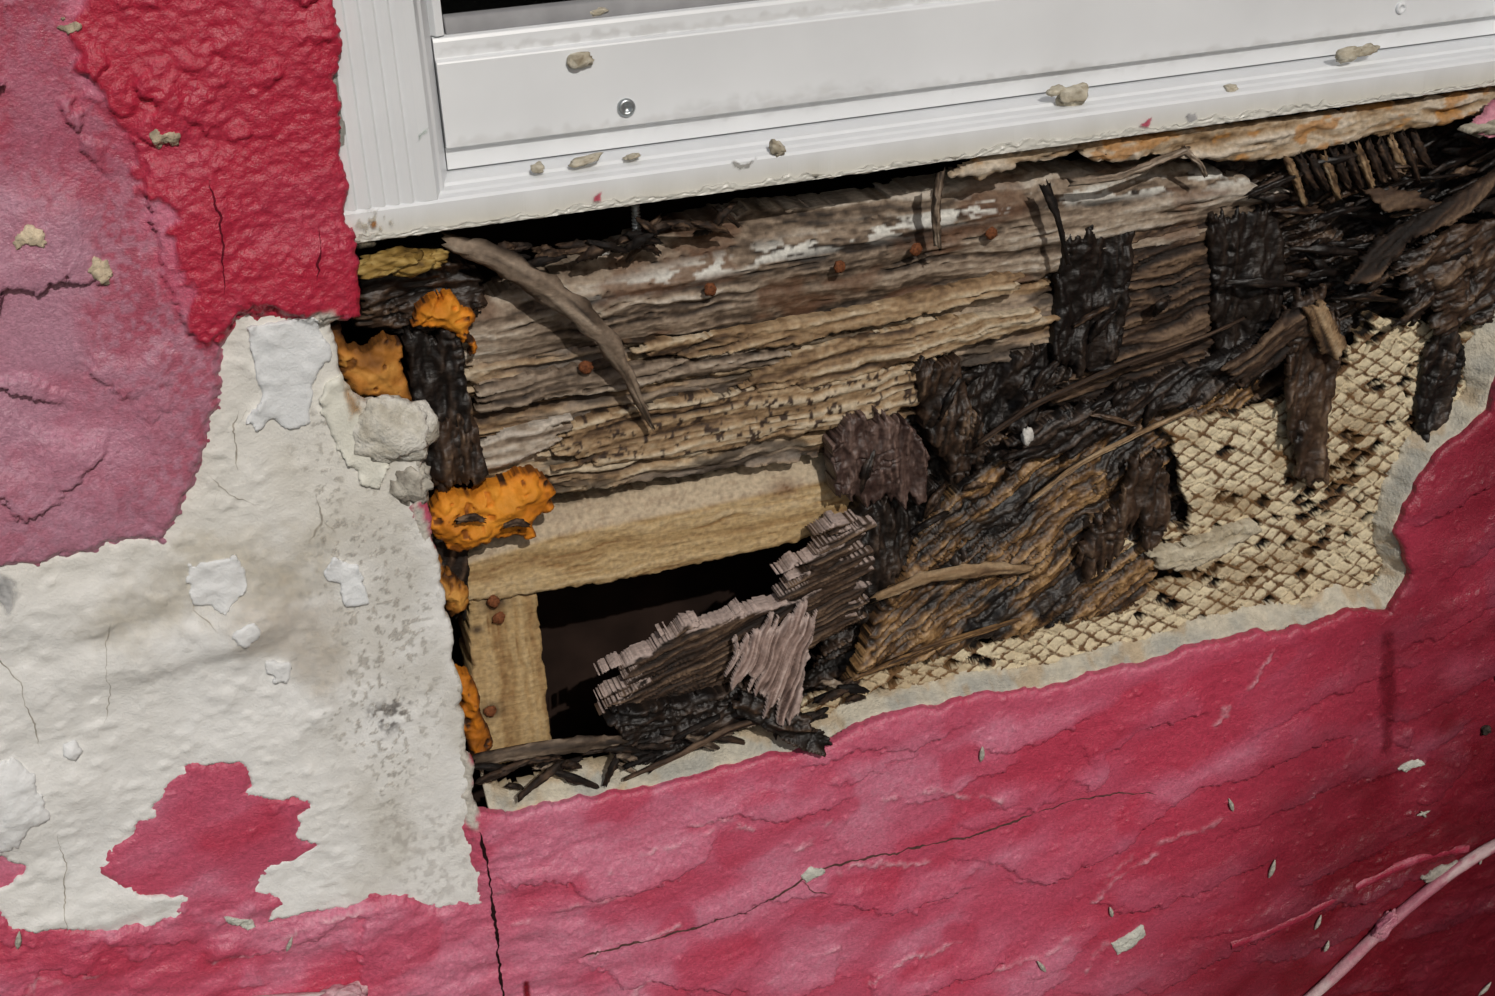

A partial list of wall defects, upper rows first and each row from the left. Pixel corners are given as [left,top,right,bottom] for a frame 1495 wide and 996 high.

spalling [57,17,82,35]
spalling [149,129,181,149]
peeling [355,79,1495,261]
spalling [12,224,47,250]
spalling [88,256,113,286]
spalling [464,258,498,284]
spalling [810,314,1495,738]
peeling [0,315,813,934]
spalling [803,641,823,683]
spalling [1398,759,1425,772]
crack [480,833,505,996]